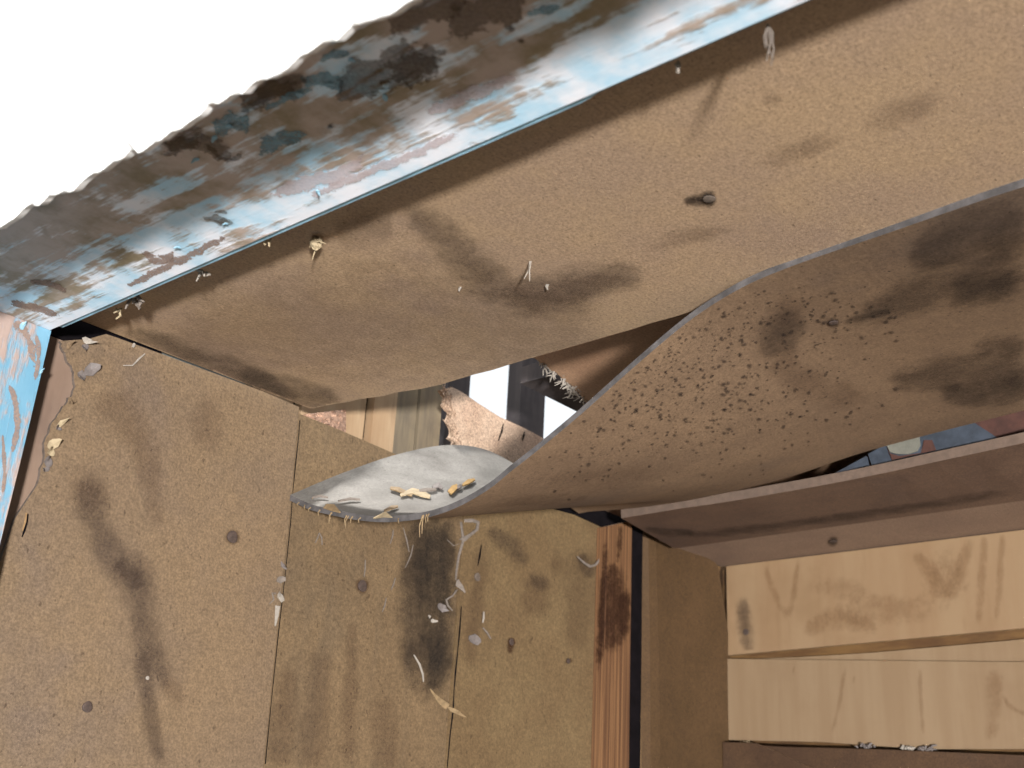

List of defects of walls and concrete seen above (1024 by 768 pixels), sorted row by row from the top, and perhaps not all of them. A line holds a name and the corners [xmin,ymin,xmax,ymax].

peeling [167,0,560,163]
peeling [270,133,458,198]
peeling [30,280,66,293]
peeling [127,211,232,287]
peeling [448,478,475,495]
water stain [597,530,630,662]
crack [447,606,462,768]